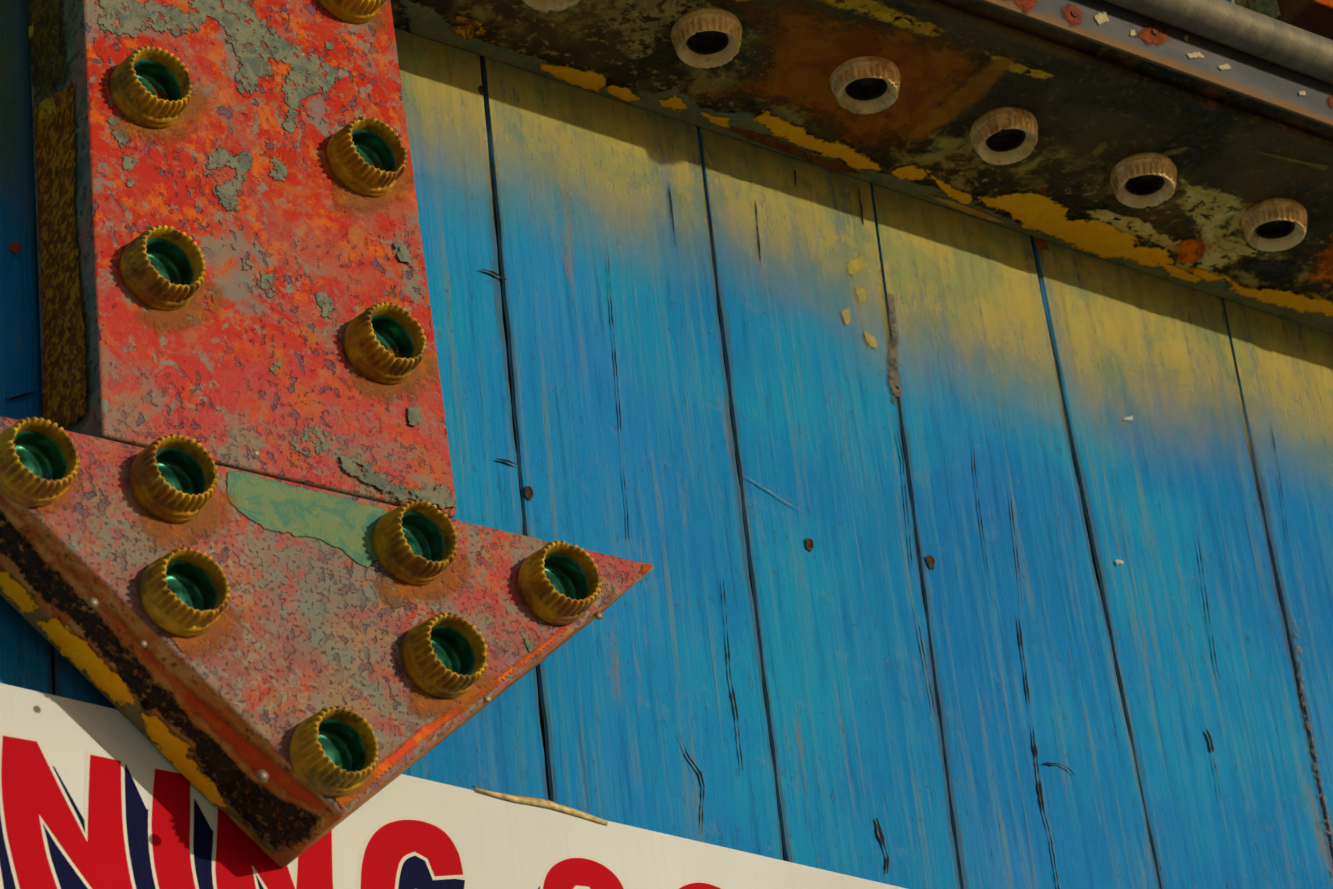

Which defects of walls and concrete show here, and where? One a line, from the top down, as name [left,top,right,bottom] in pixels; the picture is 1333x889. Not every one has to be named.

peeling [825,0,944,37]
peeling [1095,11,1110,24]
rust [1136,23,1168,45]
peeling [540,64,730,129]
rust [700,0,1014,147]
peeling [985,52,1055,79]
peeling [753,108,1333,325]
rust [1309,234,1333,283]
peeling [864,295,902,402]